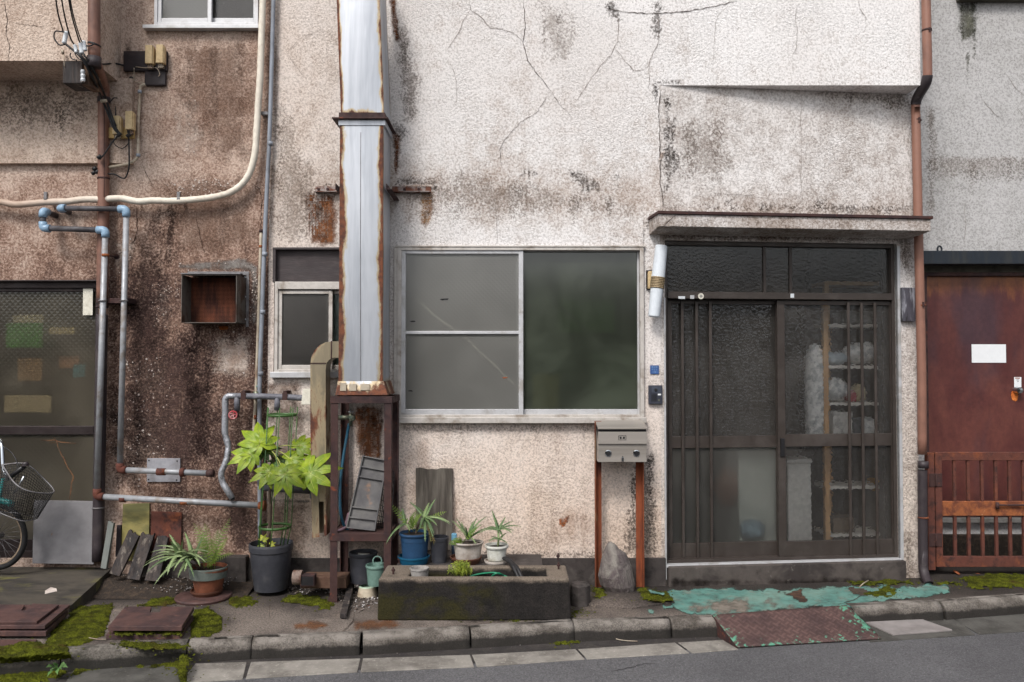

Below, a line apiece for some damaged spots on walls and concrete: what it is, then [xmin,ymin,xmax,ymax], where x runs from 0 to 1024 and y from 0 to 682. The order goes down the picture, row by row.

crack [449,1,734,244]
water stain [664,119,679,192]
rust [306,193,337,243]
rust [421,192,433,224]
water stain [110,211,220,487]
rust [354,405,383,458]
water stain [625,456,656,554]